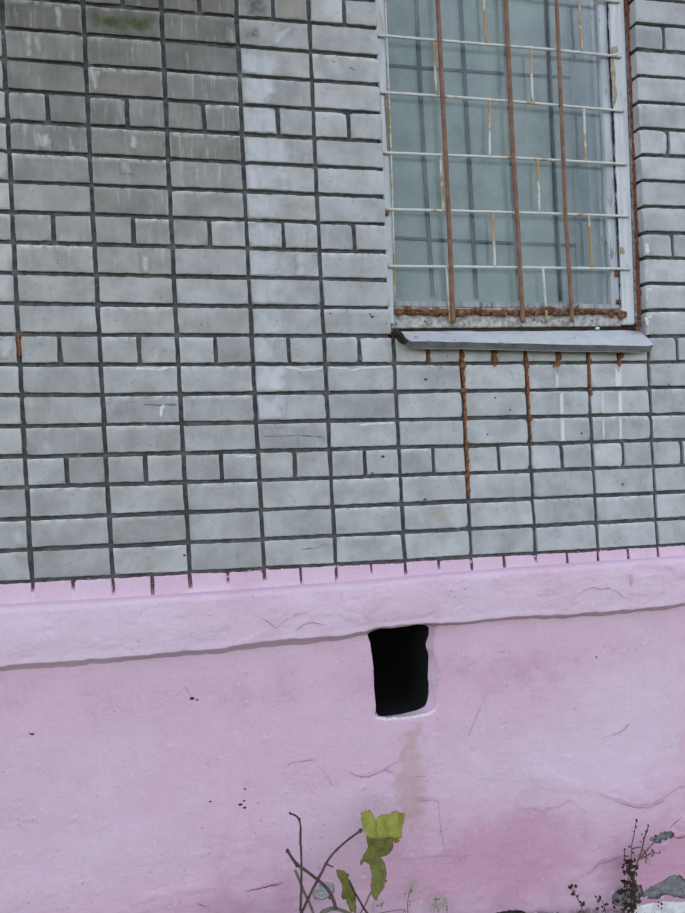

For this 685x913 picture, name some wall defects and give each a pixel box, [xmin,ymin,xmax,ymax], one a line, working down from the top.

corrosion [491,350,499,371]
corrosion [552,351,562,376]
corrosion [586,352,594,402]
corrosion [524,351,535,448]
corrosion [459,349,472,499]
spalling [650,830,674,843]
spalling [610,873,685,913]